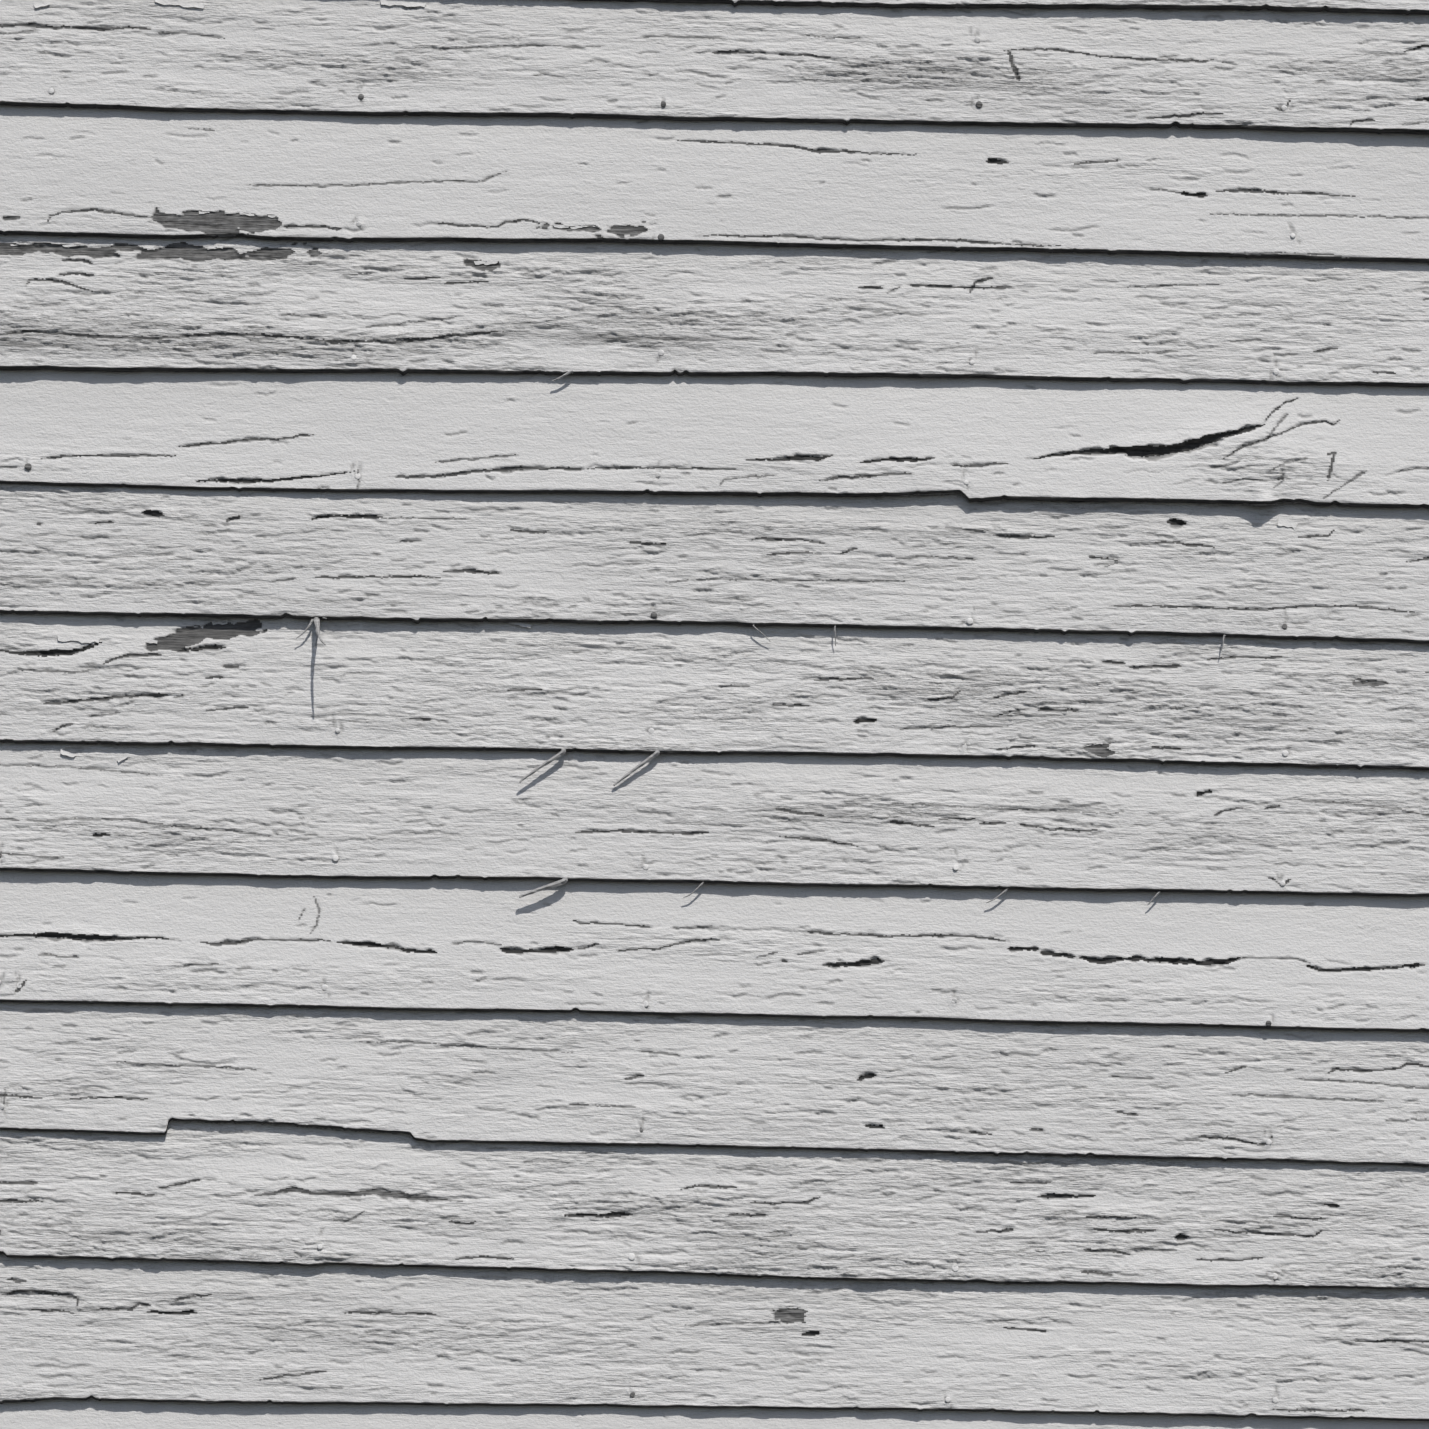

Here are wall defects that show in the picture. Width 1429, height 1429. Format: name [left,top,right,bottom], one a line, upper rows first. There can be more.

peeling [0,207,322,261]
crack [396,398,1429,538]
crack [0,434,499,582]
crack [630,539,666,547]
crack [665,527,1055,583]
crack [1089,555,1118,567]
crack [1155,540,1215,548]
crack [1114,604,1415,613]
peeling [146,619,267,652]
crack [0,896,720,992]
crack [756,931,1425,972]
peeling [773,1305,819,1336]